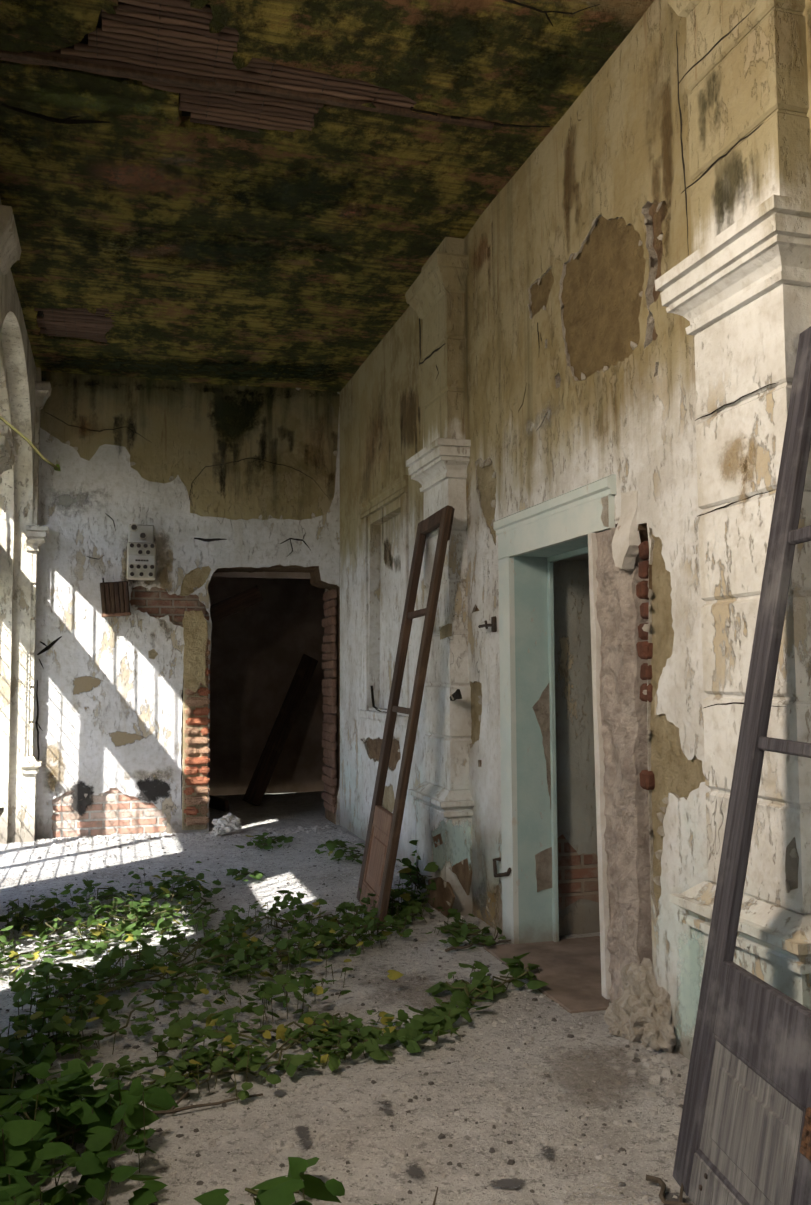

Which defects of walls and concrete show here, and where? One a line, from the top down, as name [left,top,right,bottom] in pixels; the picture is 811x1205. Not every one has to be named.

crack [504,0,600,27]
damp [564,133,579,244]
damp [653,85,672,251]
crack [676,8,764,256]
damp [714,155,741,235]
flaking render [528,201,668,388]
peeling [40,371,340,520]
damp [208,395,292,490]
flaking render [130,566,211,627]
crack [280,533,310,555]
flaking render [601,491,705,918]
flaking render [361,736,401,812]